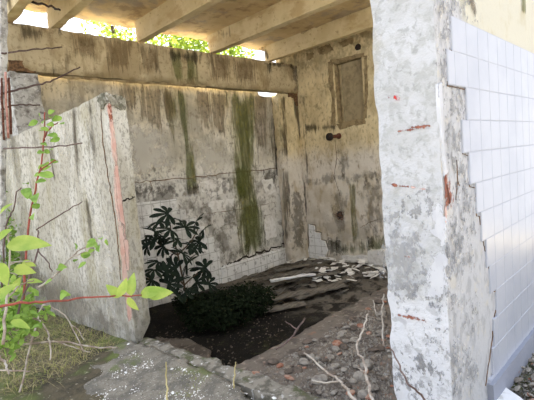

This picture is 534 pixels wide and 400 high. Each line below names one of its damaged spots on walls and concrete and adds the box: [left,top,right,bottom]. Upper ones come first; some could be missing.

leakage [22,26,38,39]
leakage [170,50,198,79]
spalling [97,92,127,110]
crack [100,108,135,280]
corrosion [107,103,129,281]
leakage [165,91,199,195]
leakage [226,93,266,253]
corrosion [444,175,454,222]
crack [207,202,284,270]